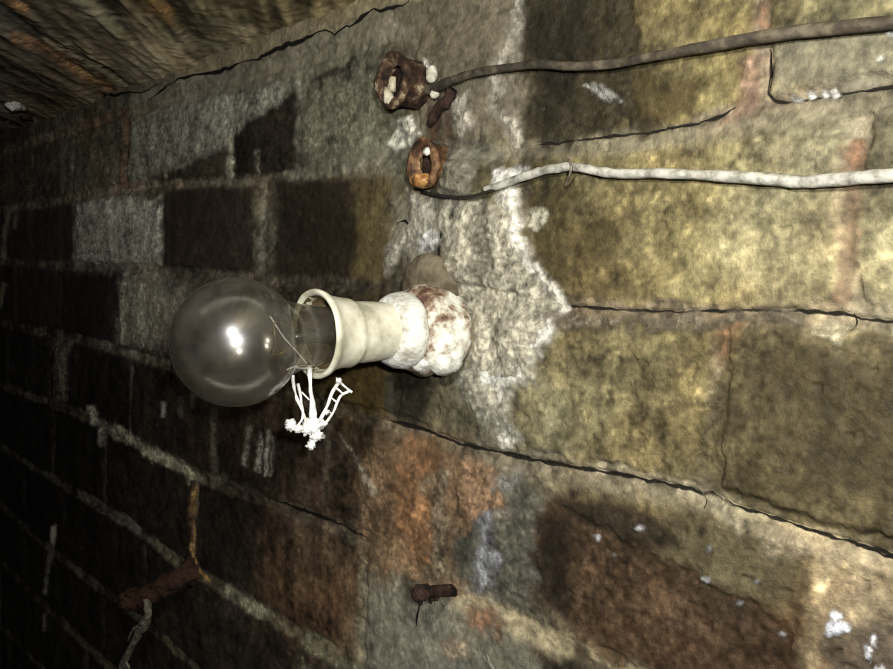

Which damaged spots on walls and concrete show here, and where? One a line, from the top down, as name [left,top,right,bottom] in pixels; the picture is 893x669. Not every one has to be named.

crack [102,0,409,100]
crack [767,49,893,104]
damp [387,115,421,150]
damp [451,93,472,162]
crack [539,107,736,145]
damp [385,166,568,448]
crack [567,305,893,331]
corrosion [188,486,210,582]
corrosion [361,436,505,606]
crack [382,418,893,559]
damp [822,611,893,669]